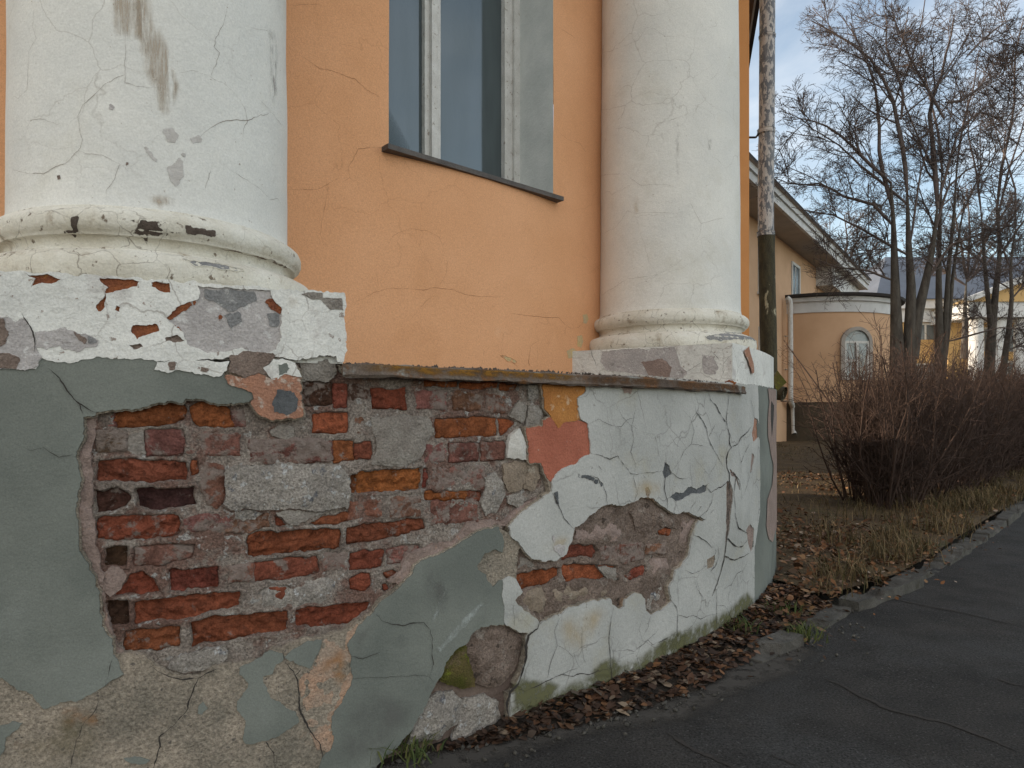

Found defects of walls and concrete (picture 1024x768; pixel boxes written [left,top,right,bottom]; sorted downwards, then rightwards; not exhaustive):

crack [16,37,164,191]
damp [116,0,167,98]
crack [187,11,284,136]
peeling [28,274,60,286]
peeling [64,216,79,237]
peeling [96,278,138,311]
peeling [152,282,170,293]
peeling [132,220,216,244]
crack [223,249,290,269]
flaking render [0,286,603,768]
flaking render [516,485,706,621]
crack [506,395,754,720]